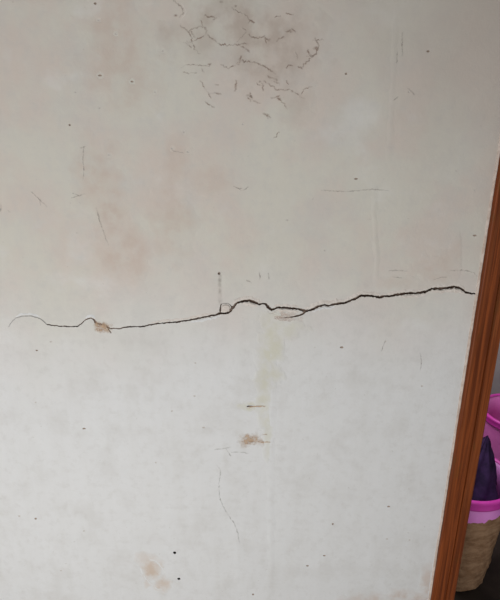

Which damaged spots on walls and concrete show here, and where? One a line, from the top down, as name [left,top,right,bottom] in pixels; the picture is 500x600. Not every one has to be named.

crack [9,283,475,333]